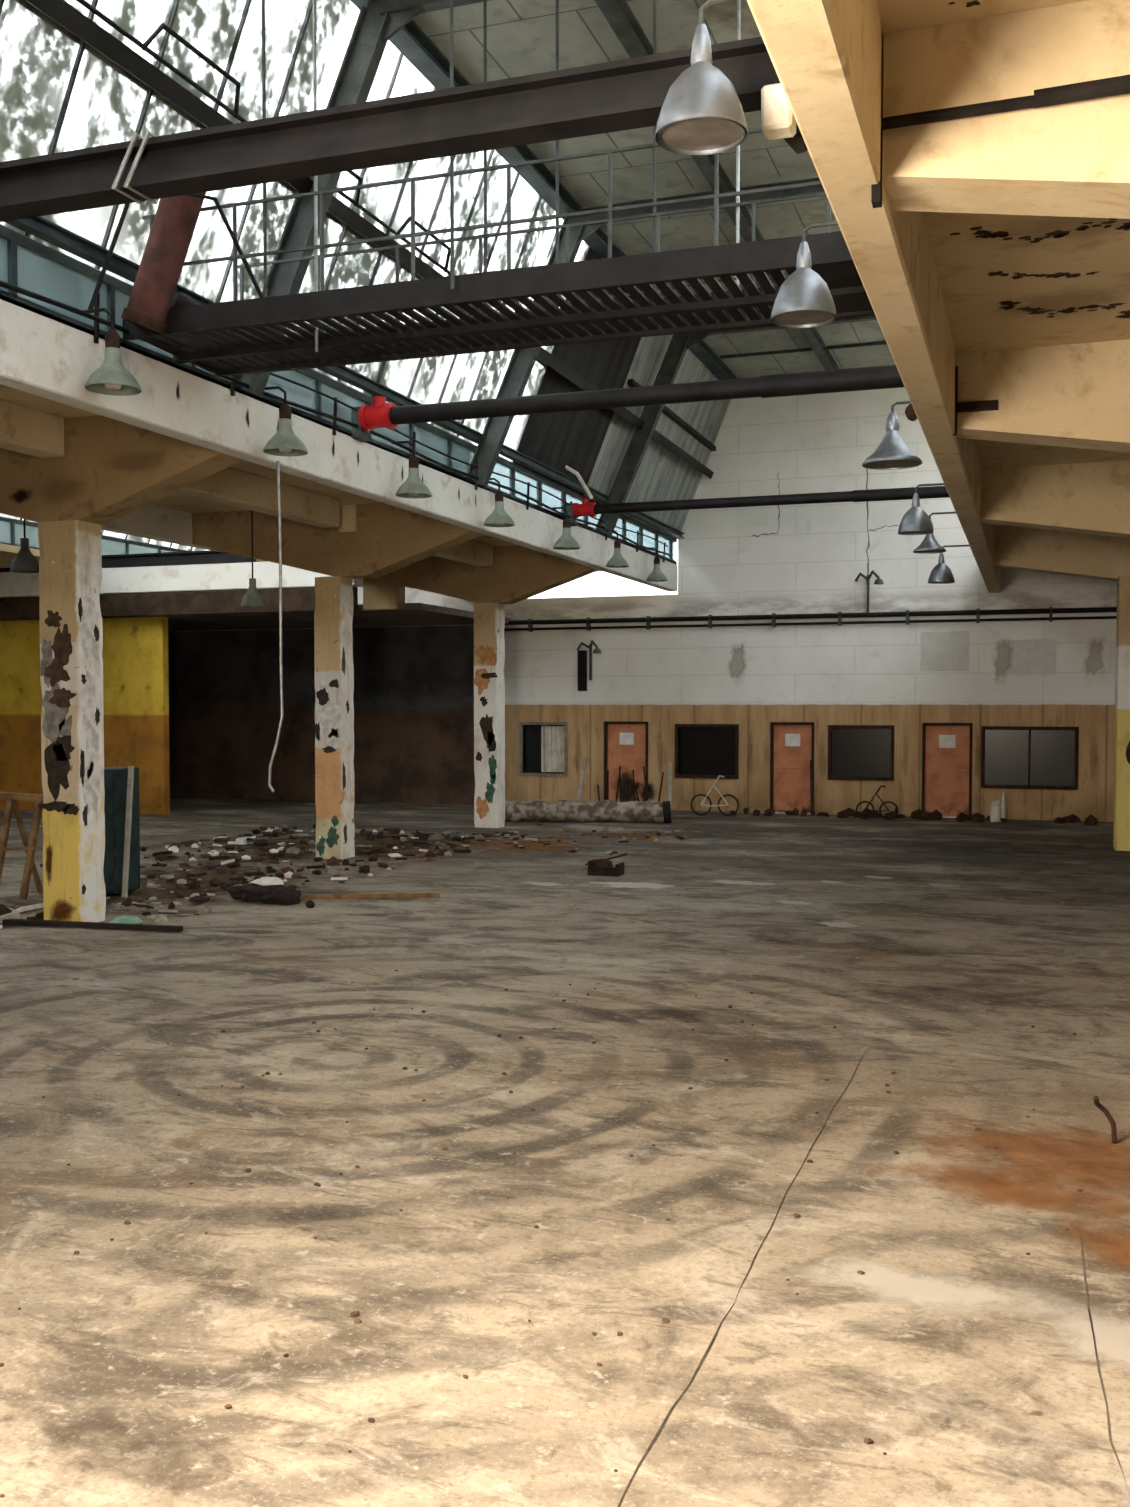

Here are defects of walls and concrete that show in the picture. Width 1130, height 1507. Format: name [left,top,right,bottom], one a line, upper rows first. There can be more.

peeling [37,597,100,826]
peeling [315,647,350,790]
peeling [473,644,498,819]
peeling [316,815,347,856]
crack [617,1049,868,1507]
corrosion [934,1133,1130,1264]